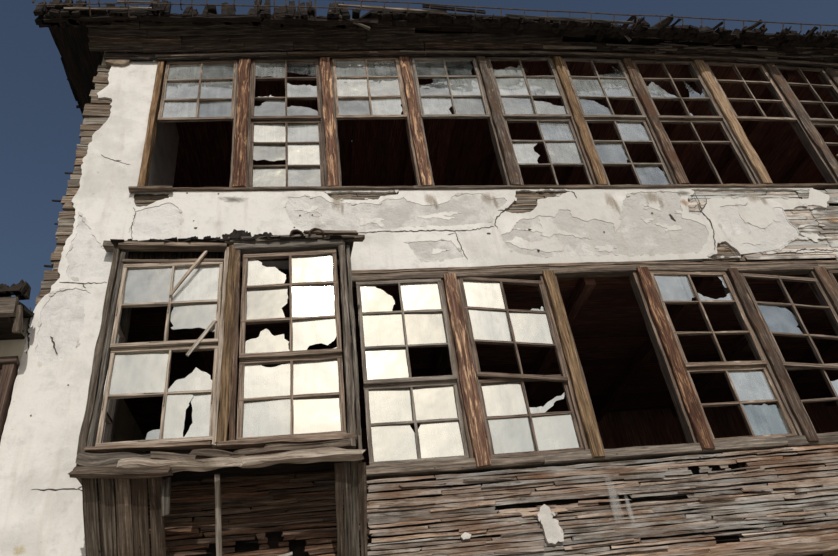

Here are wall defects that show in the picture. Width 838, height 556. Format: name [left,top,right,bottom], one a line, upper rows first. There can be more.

crack [358,204,512,260]
flaking render [283,189,825,262]
flaking render [35,211,113,367]
crack [32,484,82,492]